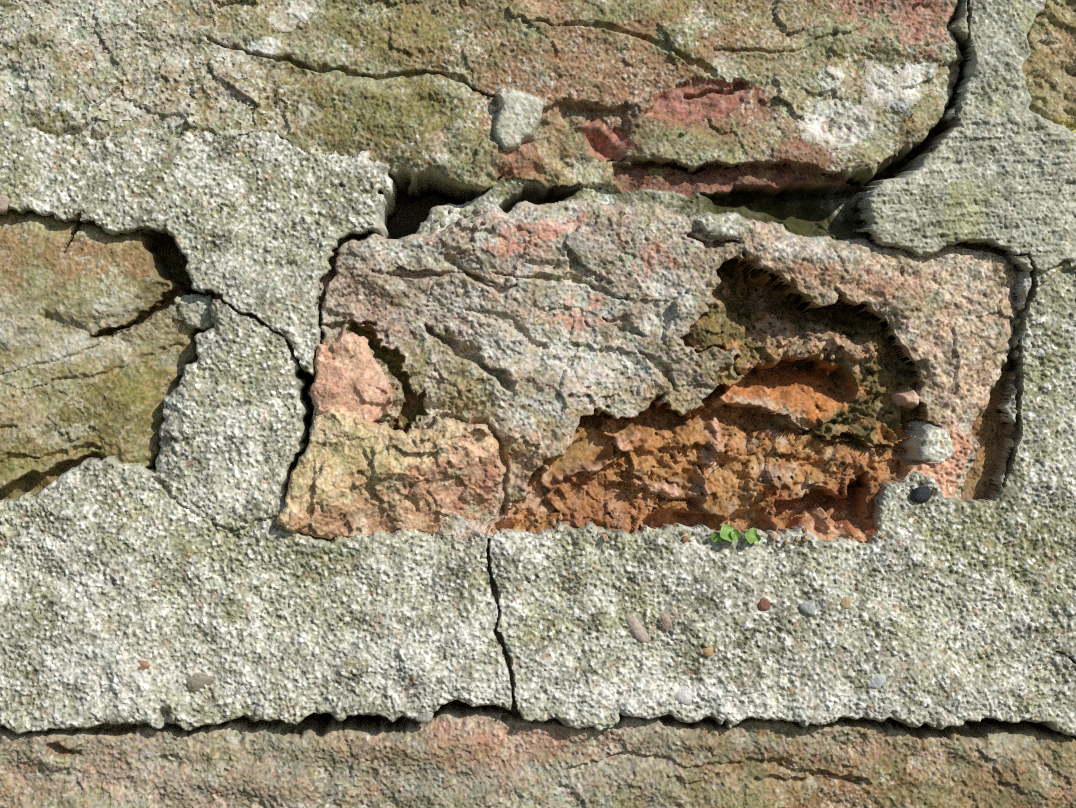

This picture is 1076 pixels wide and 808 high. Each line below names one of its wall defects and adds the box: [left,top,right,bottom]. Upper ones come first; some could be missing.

peeling [479,210,590,258]
peeling [694,213,755,243]
peeling [628,239,682,279]
spalling [490,256,956,538]
crack [486,538,519,711]
crack [1055,651,1076,665]